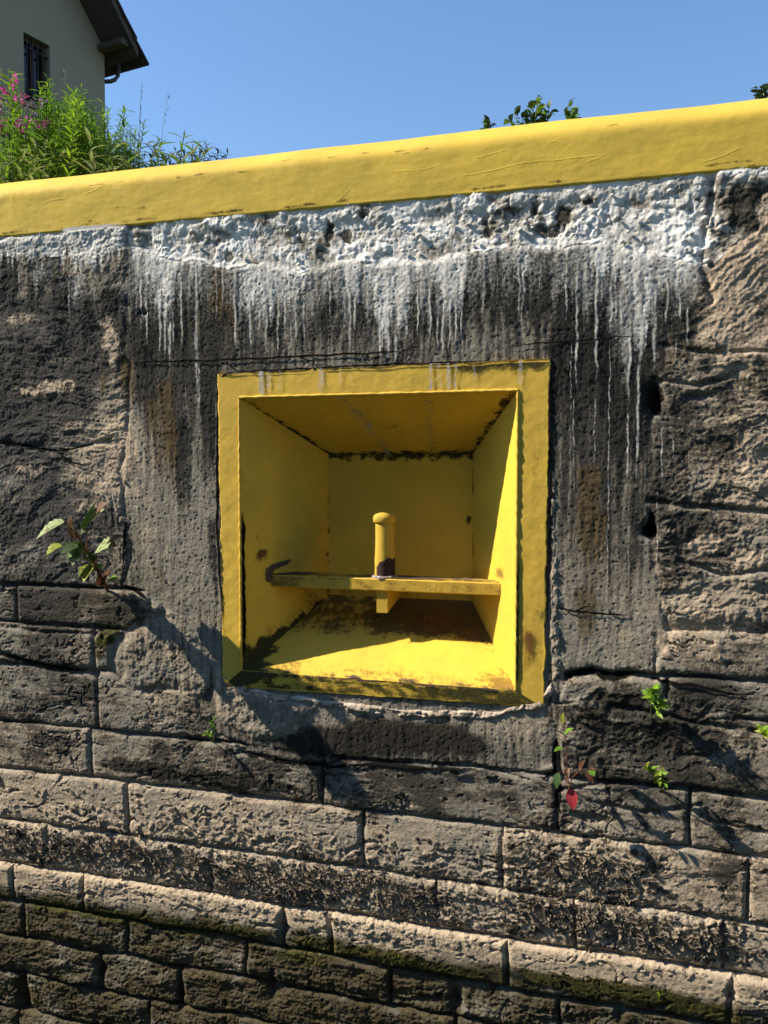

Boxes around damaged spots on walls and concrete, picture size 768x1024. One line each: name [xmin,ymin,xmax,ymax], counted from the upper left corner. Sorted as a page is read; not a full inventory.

crack [1,442,91,467]
water stain [0,218,700,600]
corrosion [376,558,395,577]
crack [511,336,637,634]